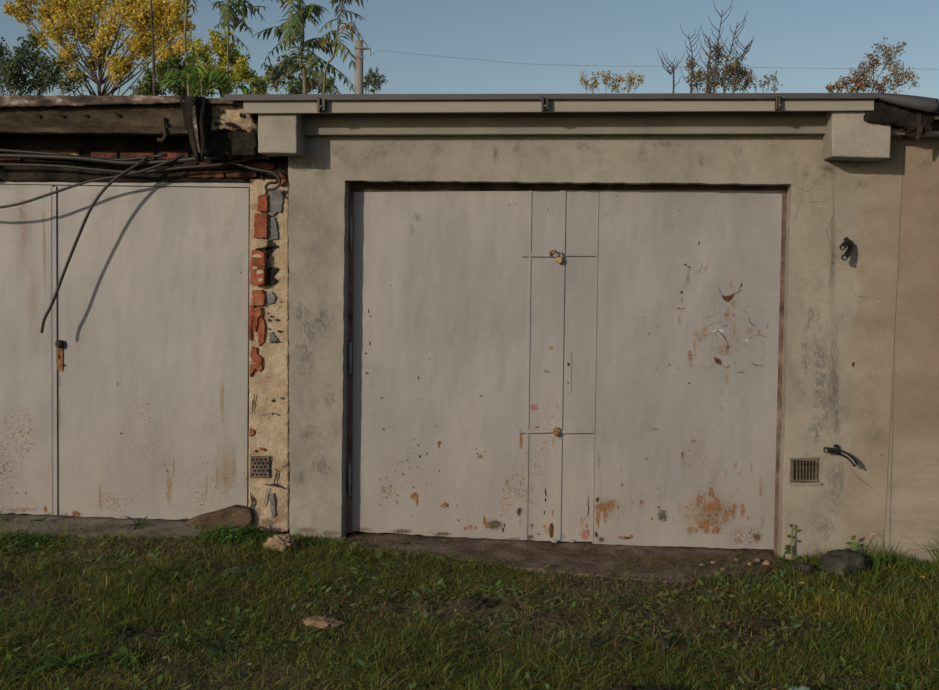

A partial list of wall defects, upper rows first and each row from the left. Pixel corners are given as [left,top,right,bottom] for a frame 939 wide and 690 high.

flaking render [240,188,282,377]
corrosion [379,439,428,507]
corrosion [595,497,619,542]
corrosion [682,488,760,543]